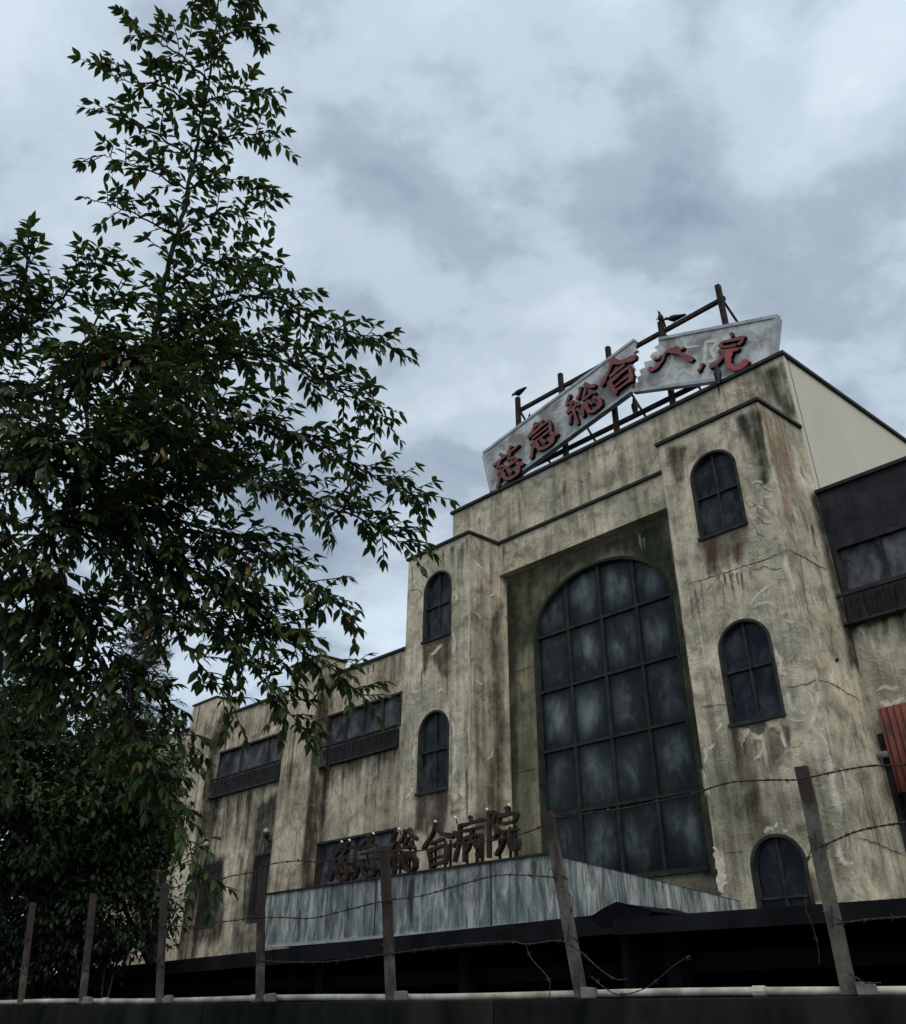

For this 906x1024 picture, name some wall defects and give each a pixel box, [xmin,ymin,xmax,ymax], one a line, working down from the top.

leakage [737,412,767,484]
crack [695,482,826,582]
rust [424,638,449,674]
flaking render [703,744,715,795]
flaking render [738,691,846,815]
leakage [227,795,276,853]
rust [416,790,447,837]
flaking render [713,847,727,893]